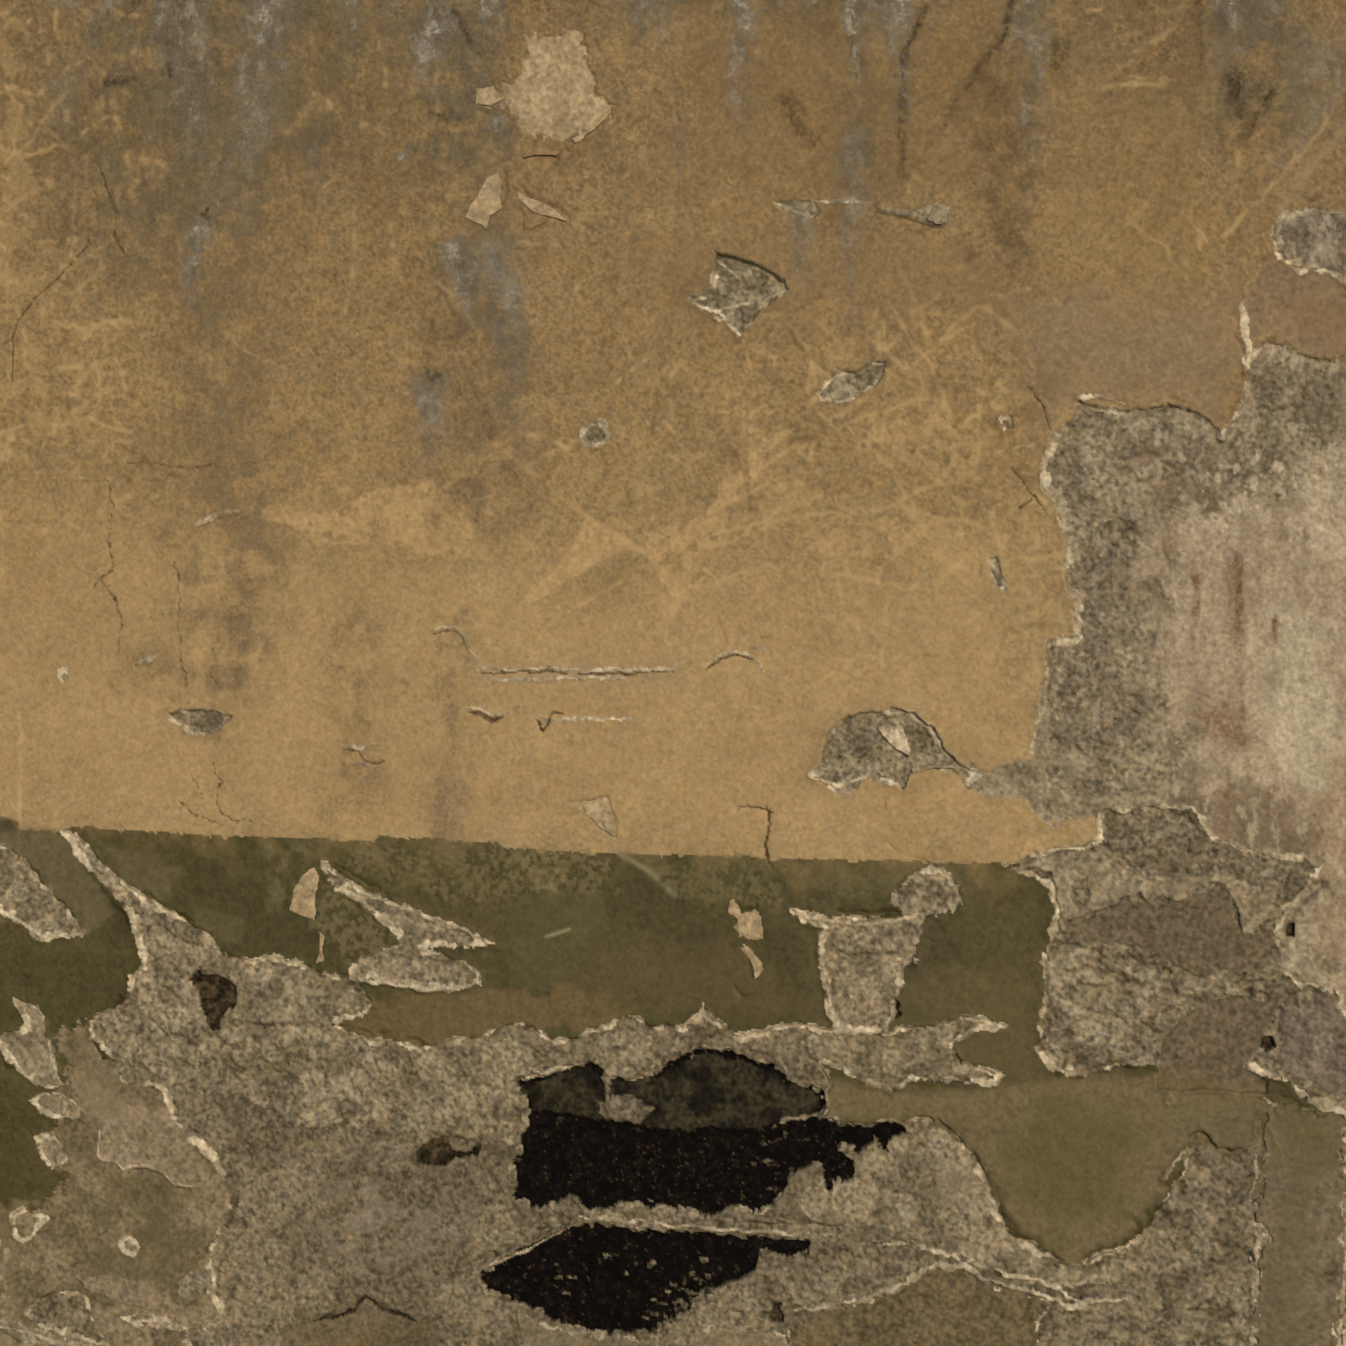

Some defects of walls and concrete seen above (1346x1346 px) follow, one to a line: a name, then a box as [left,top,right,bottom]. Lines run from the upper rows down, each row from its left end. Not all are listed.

leakage [414,0,507,169]
peeling [474,31,614,158]
leakage [844,0,926,122]
peeling [465,172,503,229]
crack [12,244,91,383]
leakage [78,0,302,548]
leakage [440,238,521,378]
spalling [687,255,790,338]
crack [126,462,227,471]
crack [93,570,124,631]
peeling [809,208,1346,1117]
spalling [0,830,1346,1346]